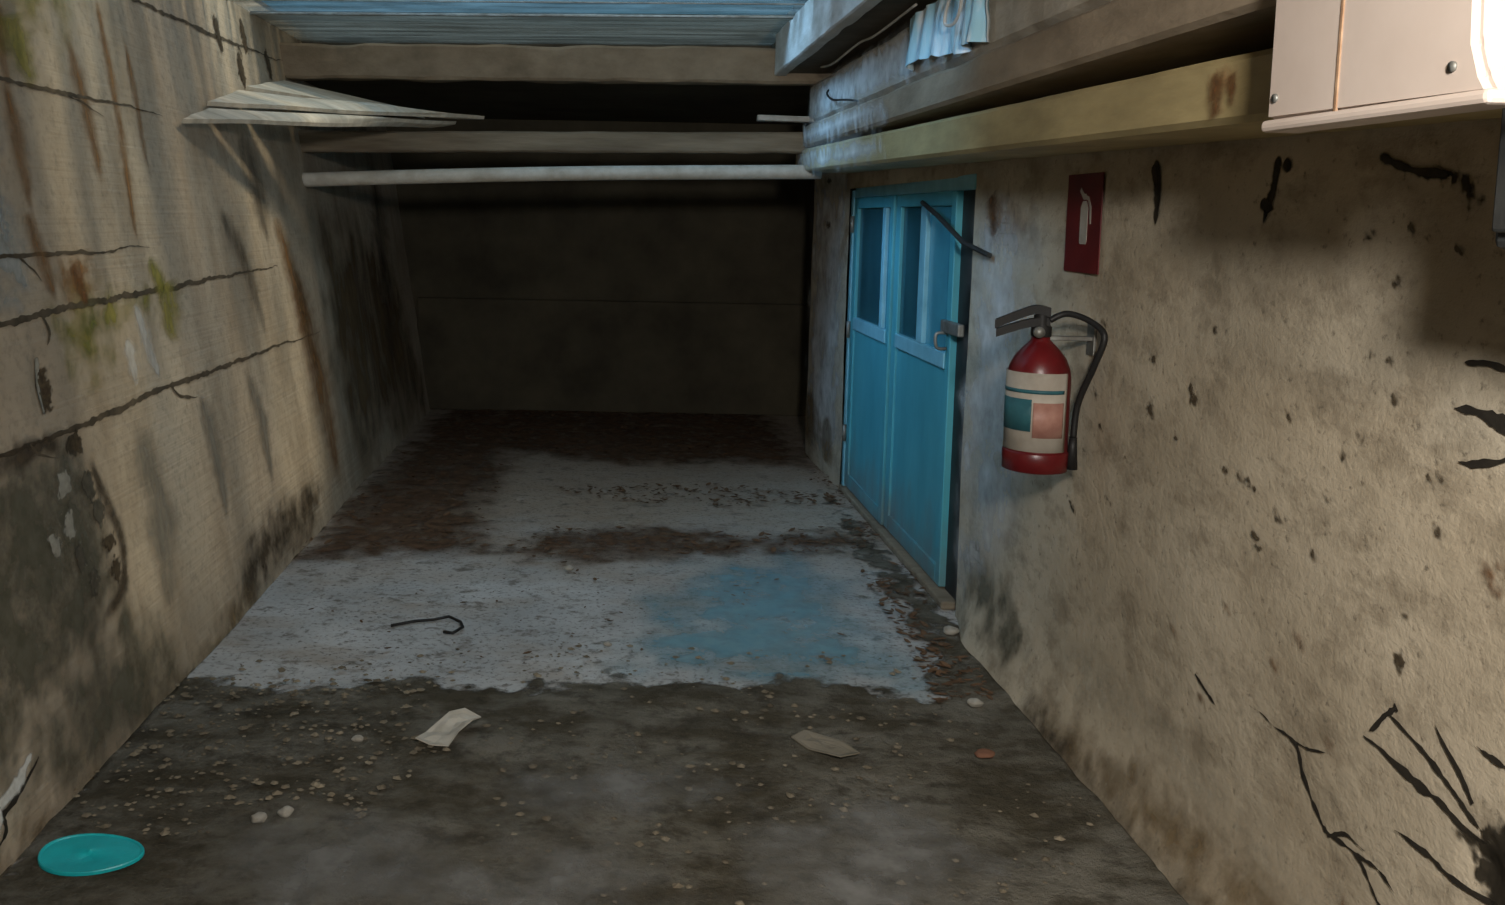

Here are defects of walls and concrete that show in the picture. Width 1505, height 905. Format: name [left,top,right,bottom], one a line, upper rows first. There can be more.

crack [132,0,283,76]
crack [0,76,162,116]
rust [1210,72,1235,116]
crack [0,245,276,345]
crack [0,331,320,458]
crack [1465,360,1505,372]
crack [1455,404,1505,468]
crack [1195,674,1216,706]
crack [1253,708,1394,905]
crack [1363,703,1505,905]